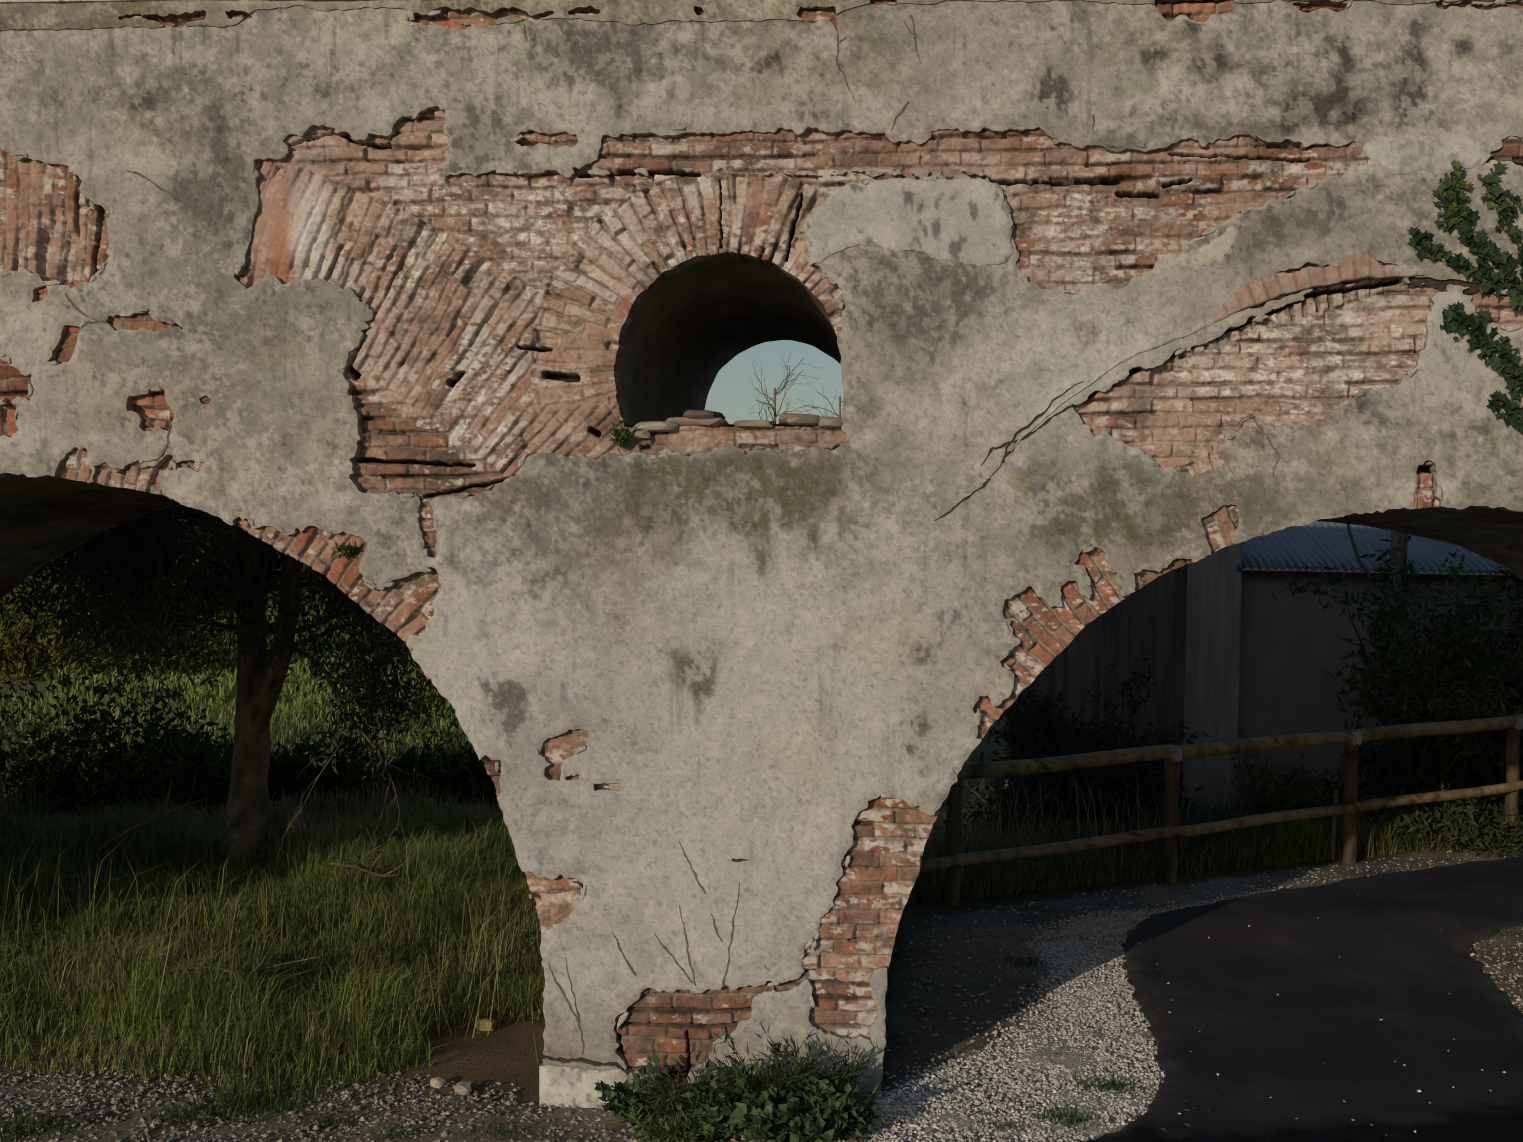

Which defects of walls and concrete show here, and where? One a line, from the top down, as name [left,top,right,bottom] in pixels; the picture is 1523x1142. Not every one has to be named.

flaking render [1154,0,1233,22]
flaking render [1479,136,1523,166]
flaking render [0,148,110,301]
flaking render [0,352,34,436]
flaking render [53,446,203,500]
flaking render [235,108,1368,652]
crack [934,381,1083,521]
crack [1236,413,1280,475]
flaking render [1072,261,1445,476]
flaking render [973,545,1190,740]
flaking render [525,872,587,934]
flaking render [614,792,939,1102]